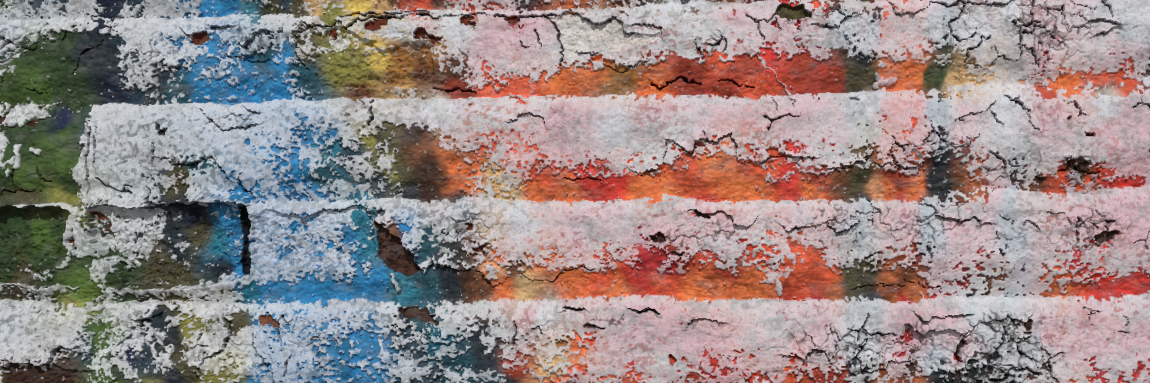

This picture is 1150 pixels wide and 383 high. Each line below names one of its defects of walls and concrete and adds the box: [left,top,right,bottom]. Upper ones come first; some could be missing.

peeling [146,0,281,132]
spalling [295,0,481,93]
crack [293,10,565,71]
crack [650,29,802,132]
peeling [503,0,987,131]
crack [926,0,1114,71]
peeling [0,25,147,292]
crack [890,94,1041,170]
spalling [81,121,1044,383]
spalling [0,340,102,383]
crack [804,278,943,371]
crack [988,326,1066,383]